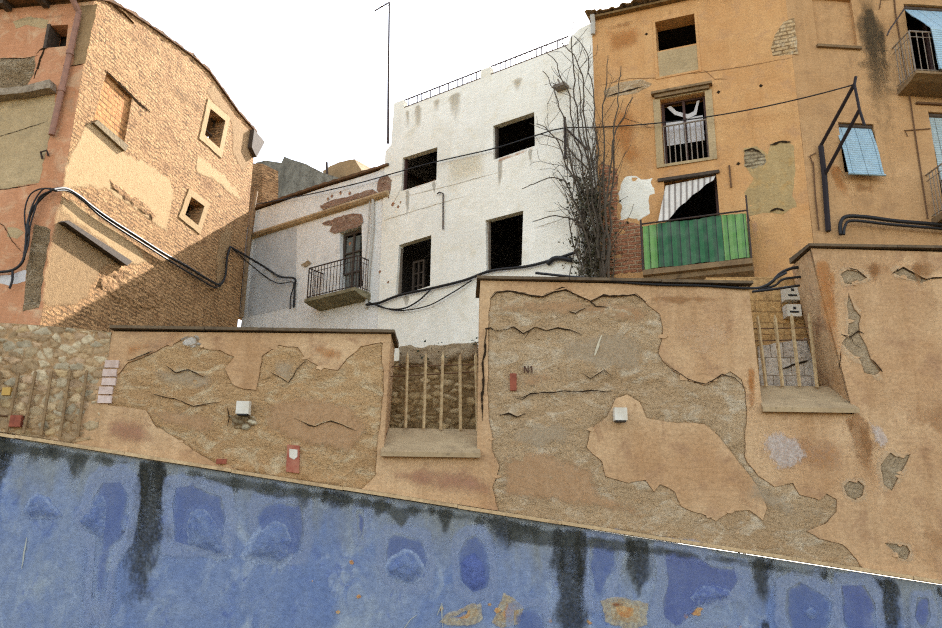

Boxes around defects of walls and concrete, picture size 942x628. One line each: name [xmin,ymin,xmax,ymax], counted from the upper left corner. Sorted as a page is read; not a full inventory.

water stain [859,10,885,86]
flaking render [320,176,401,233]
flaking render [599,162,655,275]
spalling [737,142,797,216]
spalling [839,268,883,380]
water stain [129,461,171,595]
spalling [109,335,384,489]
water stain [190,472,456,531]
peeling [440,593,523,627]
water stain [477,517,693,628]
spalling [487,290,884,628]
spalling [876,451,910,491]